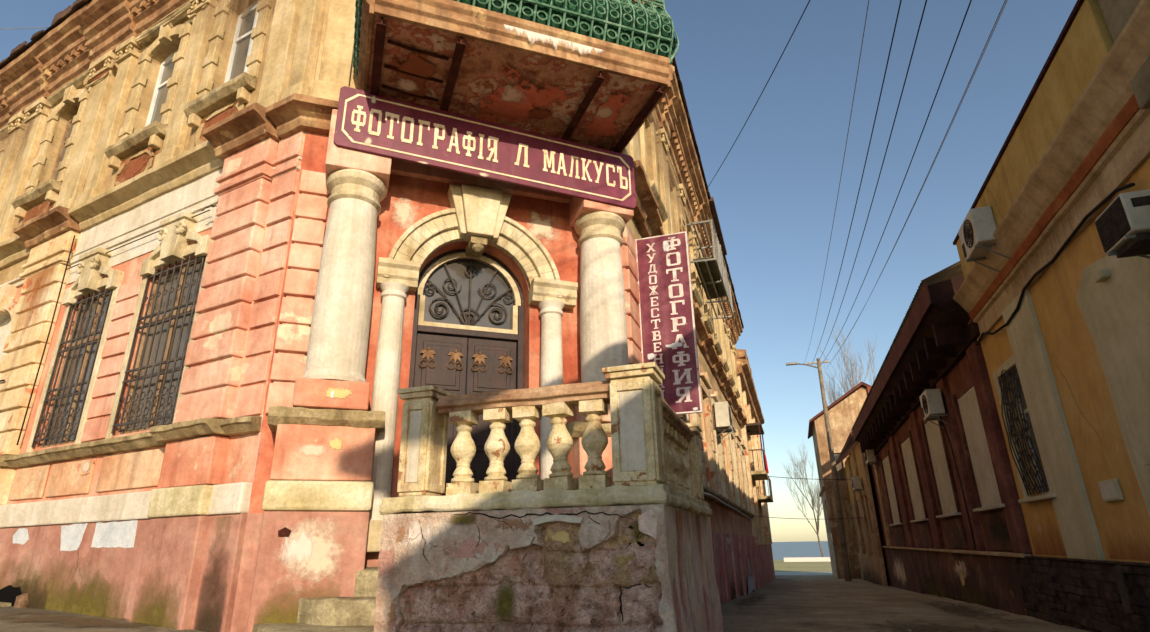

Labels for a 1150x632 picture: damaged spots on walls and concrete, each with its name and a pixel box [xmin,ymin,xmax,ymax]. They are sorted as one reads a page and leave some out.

water stain [504,24,603,54]
spalling [389,52,437,101]
spalling [474,66,571,133]
spalling [583,93,634,139]
peeling [278,519,343,581]
crack [406,520,438,563]
spalling [388,509,689,632]
crack [454,510,633,557]
water stain [195,567,222,632]
crack [619,584,650,622]